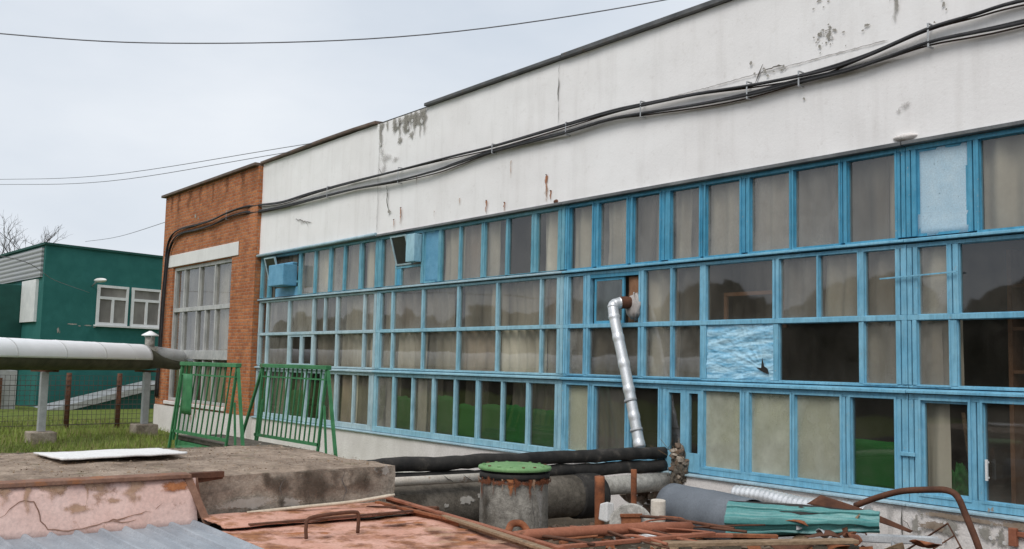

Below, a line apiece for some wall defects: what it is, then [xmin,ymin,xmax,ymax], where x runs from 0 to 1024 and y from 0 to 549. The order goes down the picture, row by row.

peeling [813,24,846,53]
peeling [379,108,427,169]